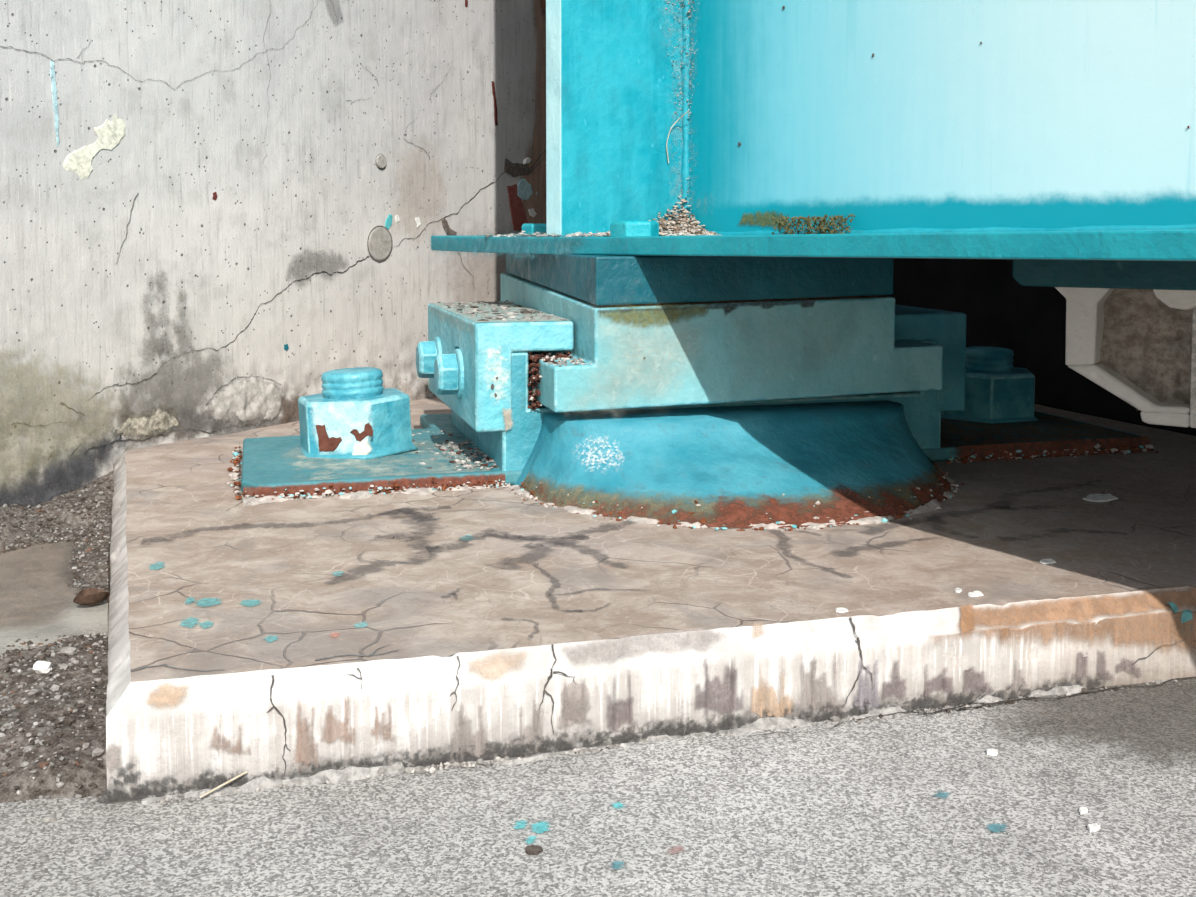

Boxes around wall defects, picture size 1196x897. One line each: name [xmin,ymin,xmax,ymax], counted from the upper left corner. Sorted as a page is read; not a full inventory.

crack [11,150,546,460]
water stain [0,433,125,507]
spalling [114,406,180,439]
peeling [315,422,373,452]
corrosion [243,474,505,498]
corrosion [520,459,951,528]
corrosion [955,436,1154,462]
corrosion [959,588,1196,649]
crack [450,656,461,710]
crack [539,644,576,732]
crack [844,617,873,705]
crack [267,675,290,775]